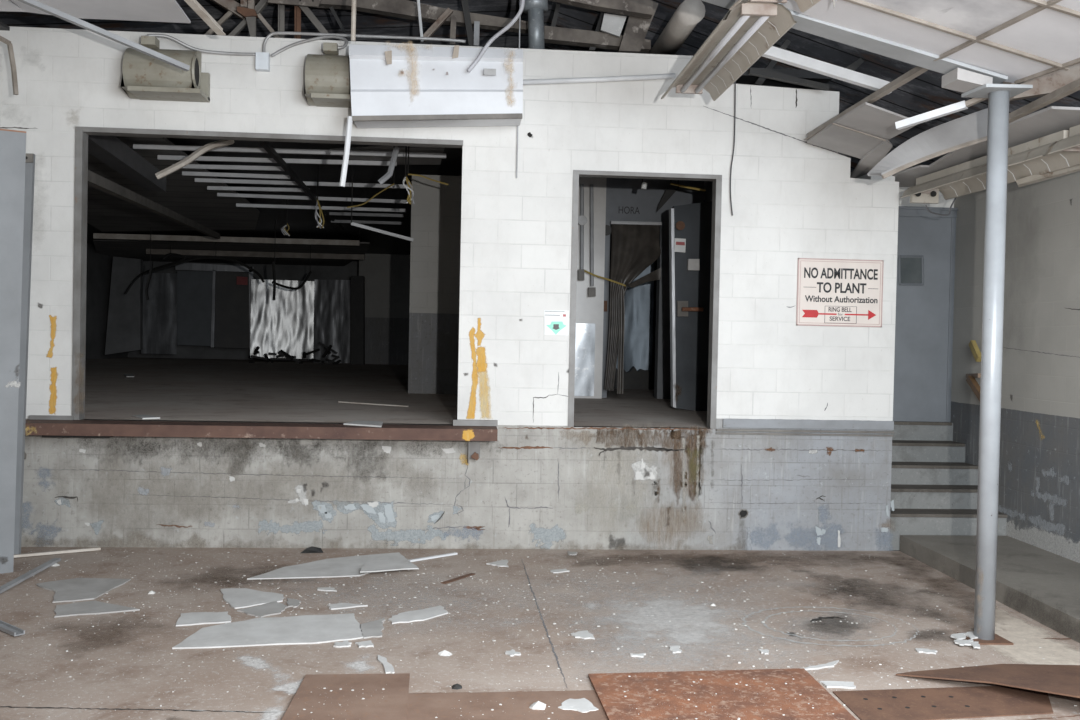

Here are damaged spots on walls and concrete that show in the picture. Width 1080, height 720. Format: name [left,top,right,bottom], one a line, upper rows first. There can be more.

water stain [182,439,324,482]
peeling [631,453,657,480]
peeling [288,485,397,529]
crack [522,562,567,691]
water stain [742,580,943,646]